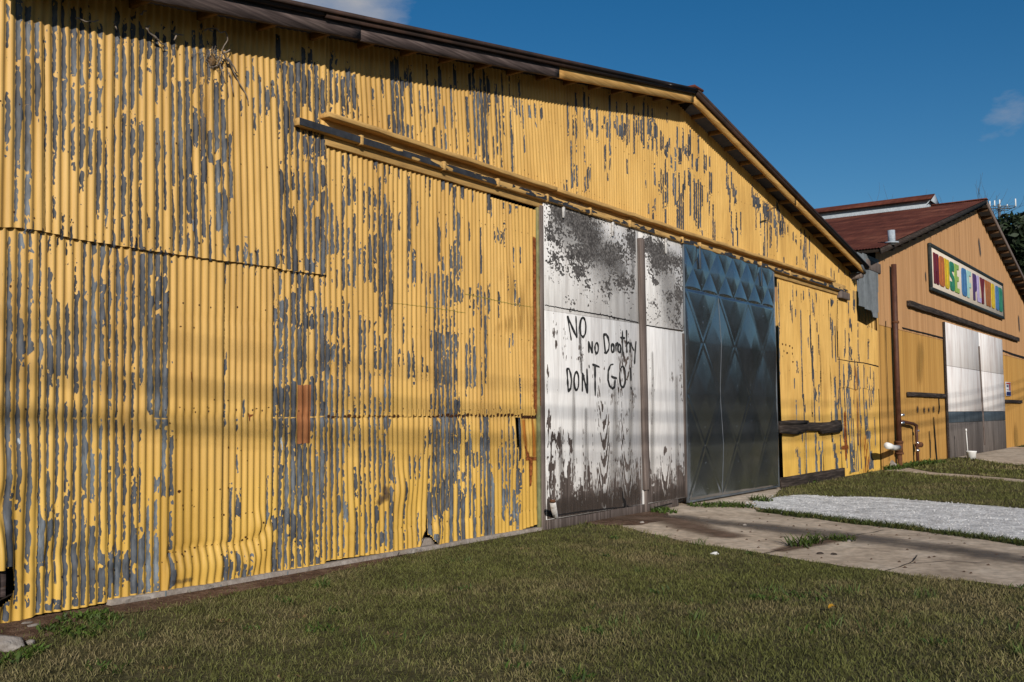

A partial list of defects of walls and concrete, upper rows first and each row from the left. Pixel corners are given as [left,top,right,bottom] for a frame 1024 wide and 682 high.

peeling [2,0,876,627]
damp [544,202,683,329]
damp [547,486,640,515]